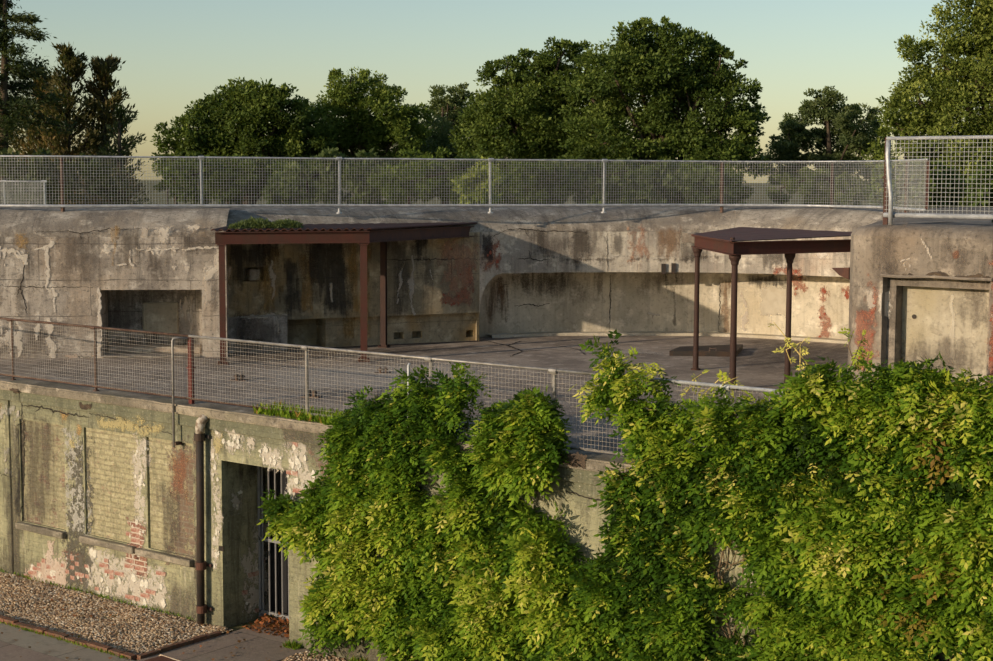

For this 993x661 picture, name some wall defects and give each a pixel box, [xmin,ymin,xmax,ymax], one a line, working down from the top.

crack [5,265,98,313]
crack [36,228,150,238]
damp [119,226,371,338]
crack [387,228,576,285]
crack [604,234,612,326]
spalling [889,271,993,288]
crack [484,340,586,356]
spalling [24,433,197,615]
peeling [207,428,331,569]
peeling [240,523,269,619]